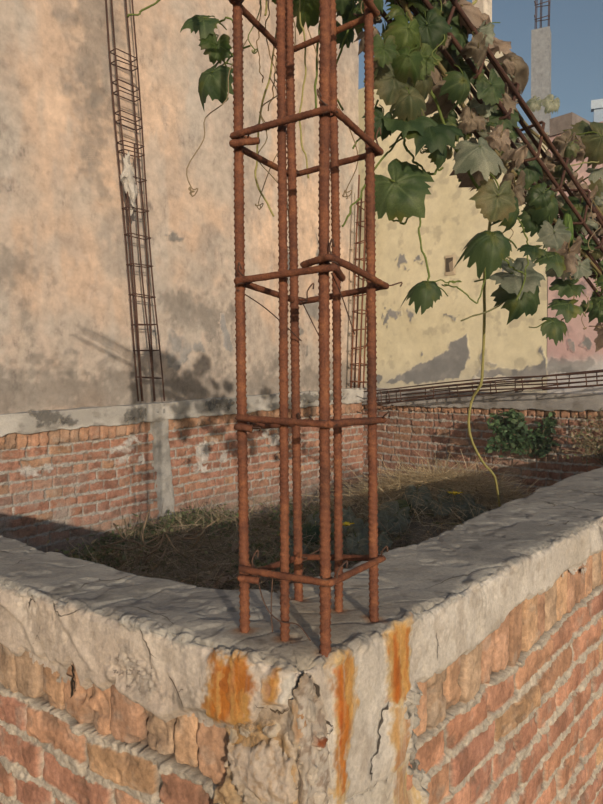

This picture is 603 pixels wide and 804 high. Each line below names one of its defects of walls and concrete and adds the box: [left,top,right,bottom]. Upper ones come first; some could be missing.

spalling [276,0,603,657]
crack [69,663,77,698]
corrosion [199,645,361,804]
spalling [228,671,334,804]
crack [367,702,389,791]
corrosion [377,611,429,804]